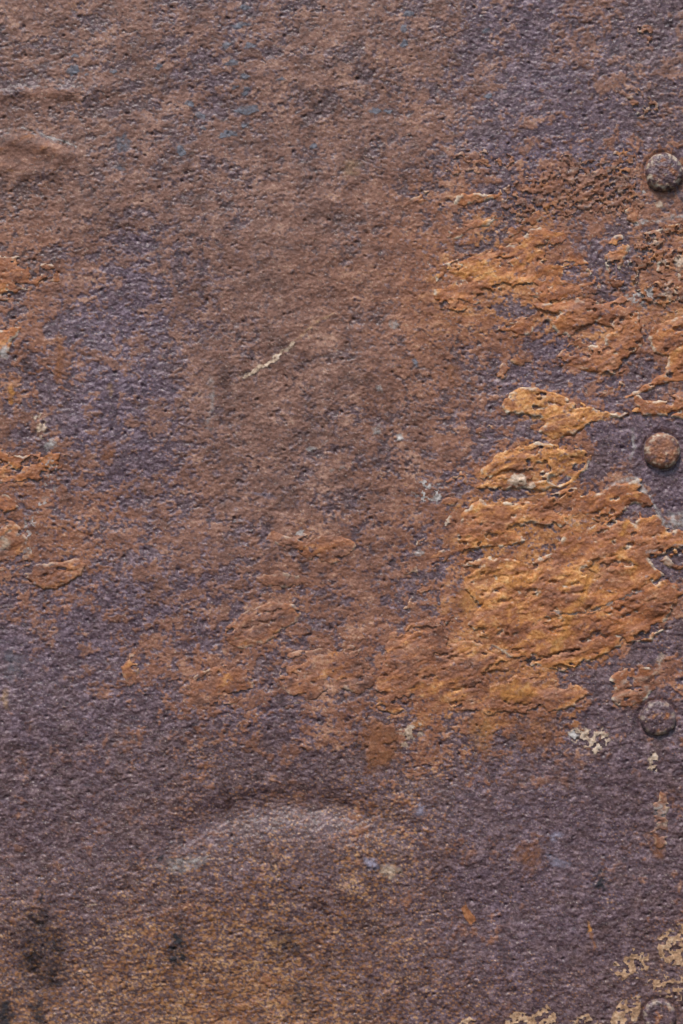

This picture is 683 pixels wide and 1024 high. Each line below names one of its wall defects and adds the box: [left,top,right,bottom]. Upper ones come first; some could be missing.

corrosion [0,255,60,301]
corrosion [0,322,21,353]
corrosion [266,148,683,768]
spalling [508,473,535,489]
corrosion [0,449,86,590]
corrosion [223,602,301,649]
corrosion [121,652,139,686]
corrosion [180,665,254,712]